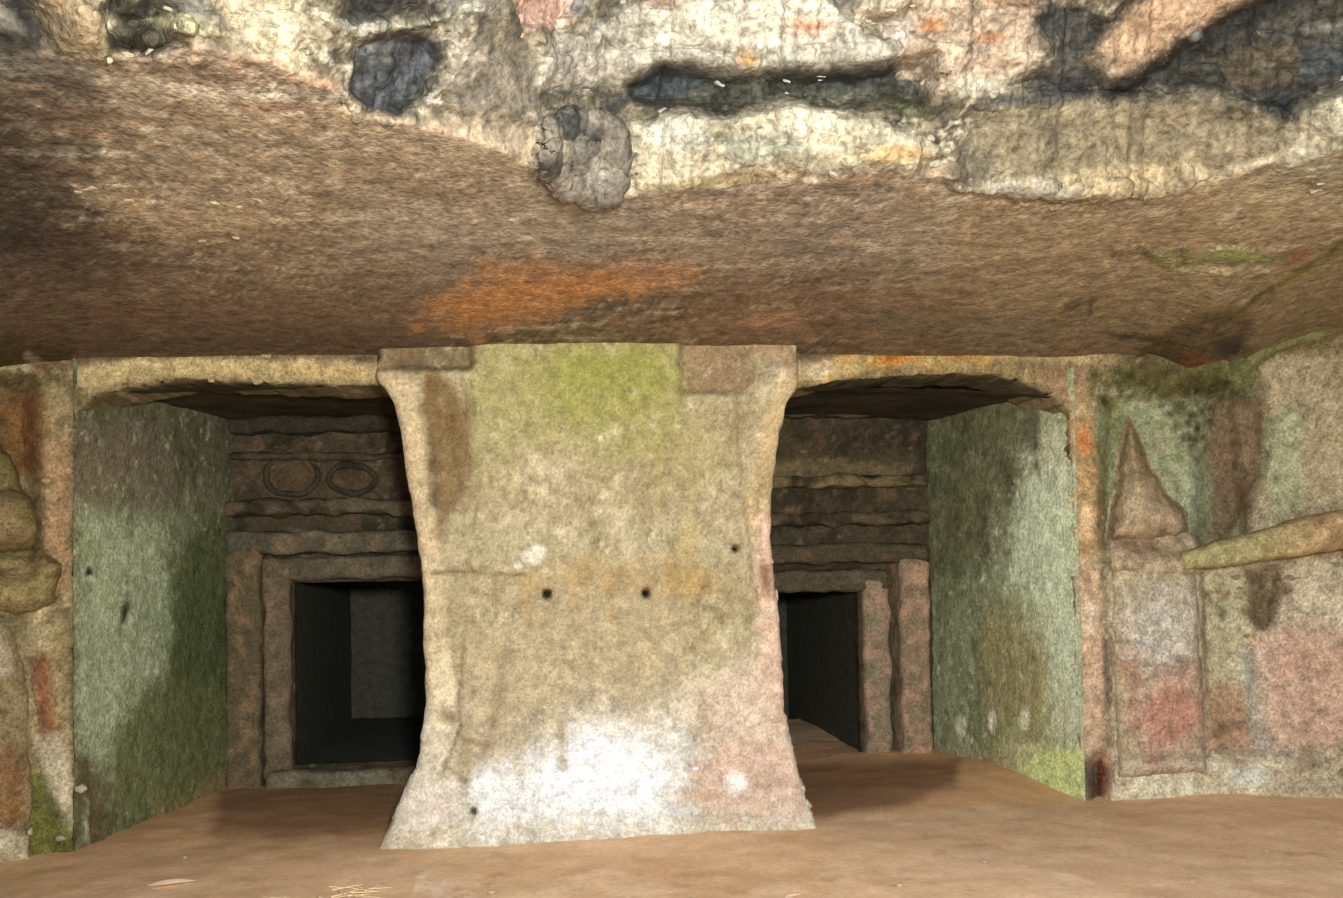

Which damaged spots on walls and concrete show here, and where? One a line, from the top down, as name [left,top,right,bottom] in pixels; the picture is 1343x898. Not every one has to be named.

water stain [416,364,488,544]
water stain [540,343,688,444]
water stain [0,571,227,862]